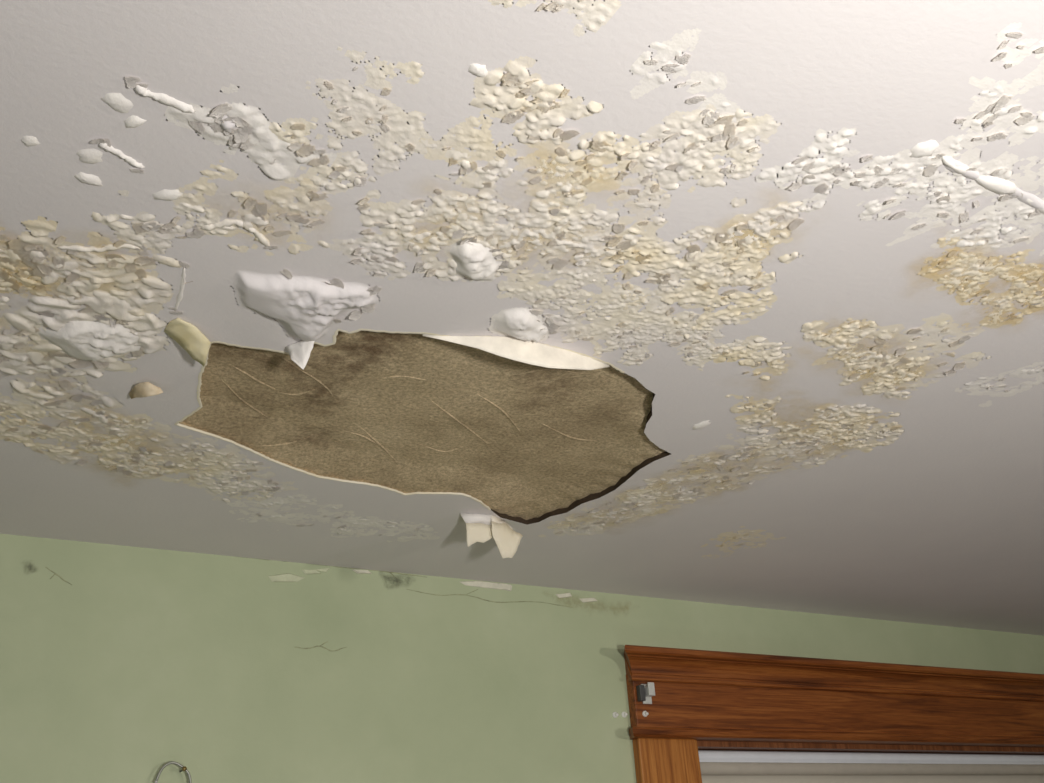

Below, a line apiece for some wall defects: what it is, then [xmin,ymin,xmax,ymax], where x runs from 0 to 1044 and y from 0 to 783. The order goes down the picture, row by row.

peeling [488,0,622,37]
spalling [0,22,1044,558]